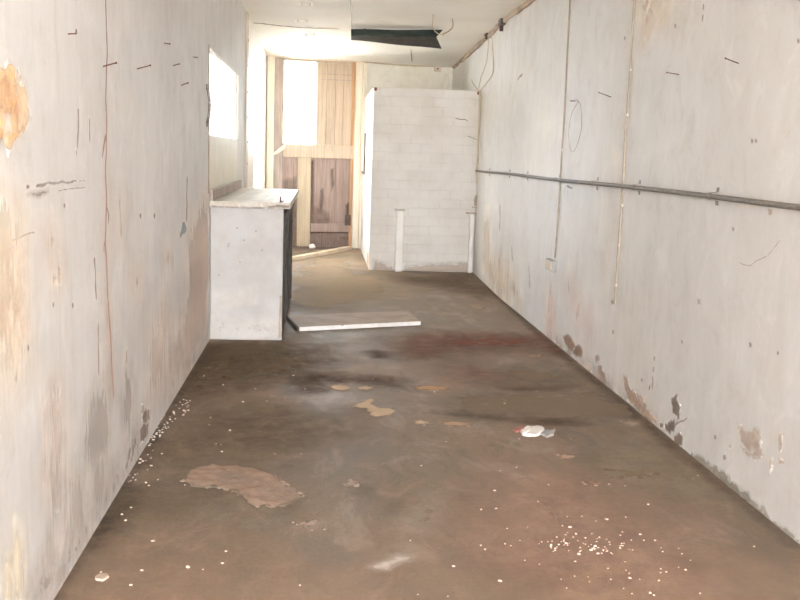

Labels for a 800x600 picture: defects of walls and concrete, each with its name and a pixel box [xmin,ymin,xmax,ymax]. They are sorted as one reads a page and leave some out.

spalling [562,334,582,358]
spalling [619,378,684,447]
peeling [738,424,783,470]